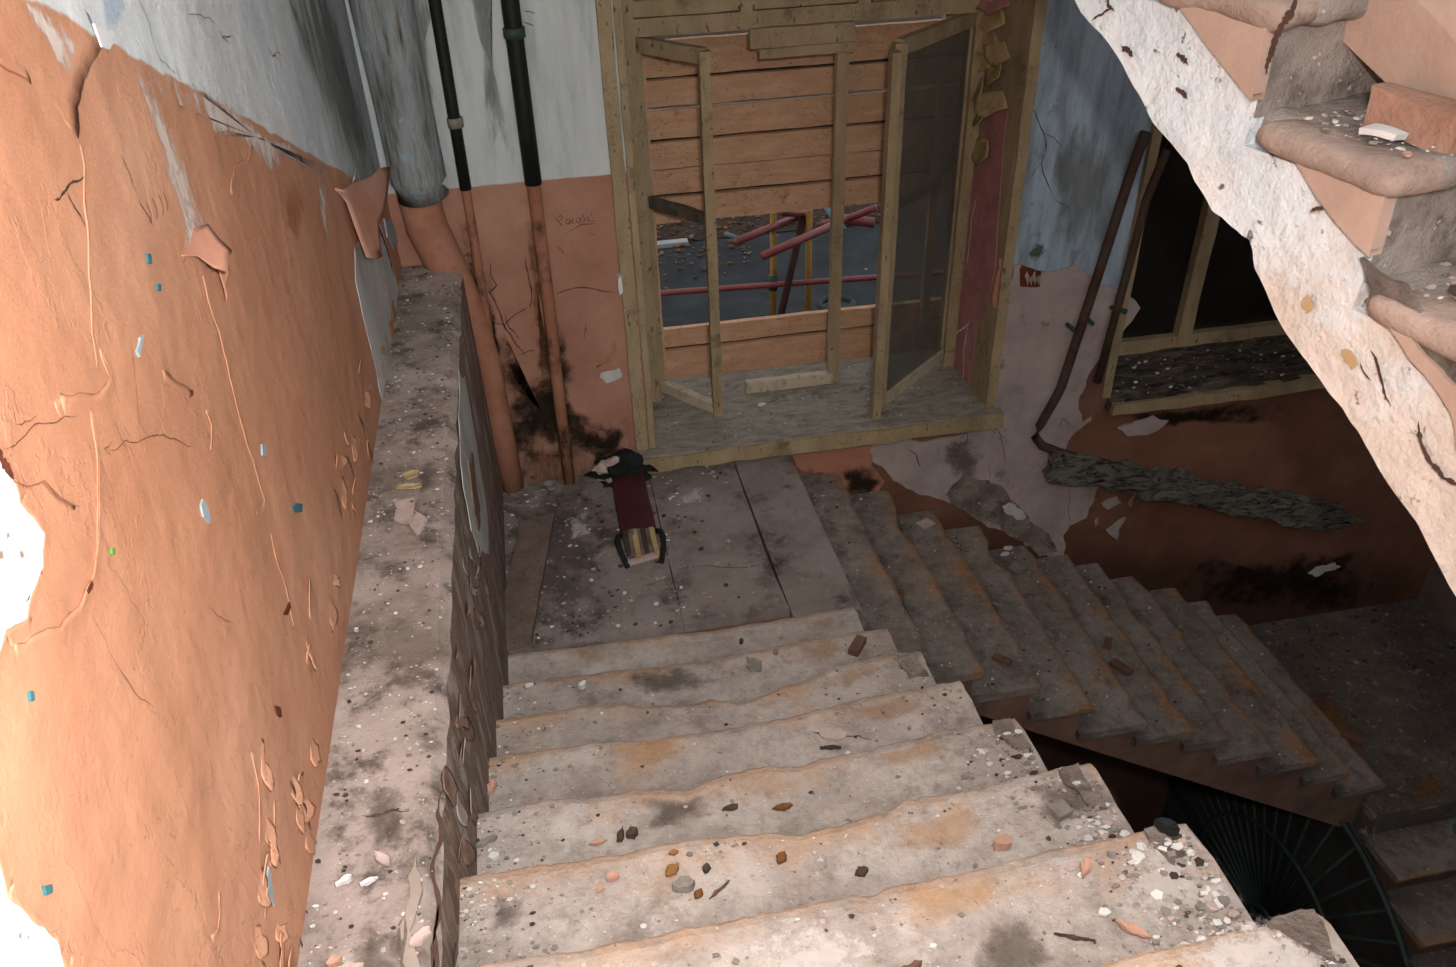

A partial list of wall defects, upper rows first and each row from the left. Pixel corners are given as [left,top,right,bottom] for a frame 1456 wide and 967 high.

leakage [291,0,365,164]
crack [1091,0,1115,21]
crack [1265,0,1297,75]
peeling [0,5,117,676]
peeling [334,166,399,515]
leakage [489,238,622,459]
peeling [1117,414,1168,436]
flaking render [1360,257,1424,313]
crack [1360,350,1456,486]
flaking render [1390,328,1456,440]
peeling [0,841,83,967]
peeling [251,738,322,967]